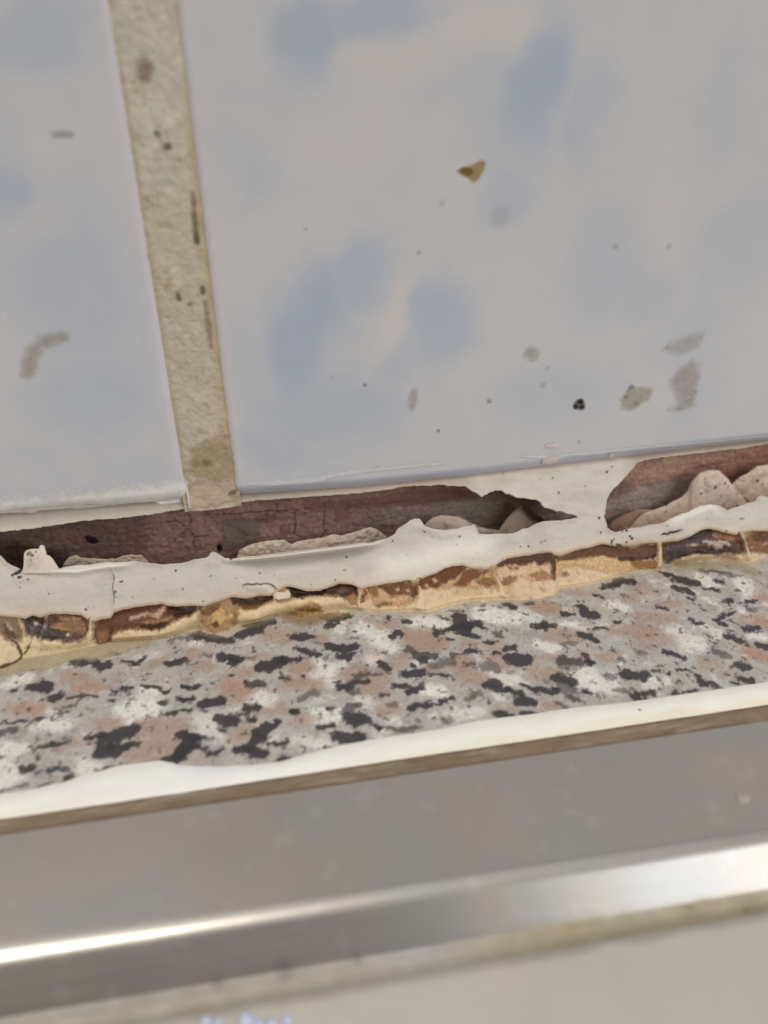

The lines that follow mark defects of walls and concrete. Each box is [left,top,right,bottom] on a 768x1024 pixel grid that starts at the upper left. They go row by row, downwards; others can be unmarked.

peeling [0,461,447,513]
peeling [304,489,475,519]
flaking render [217,514,289,552]